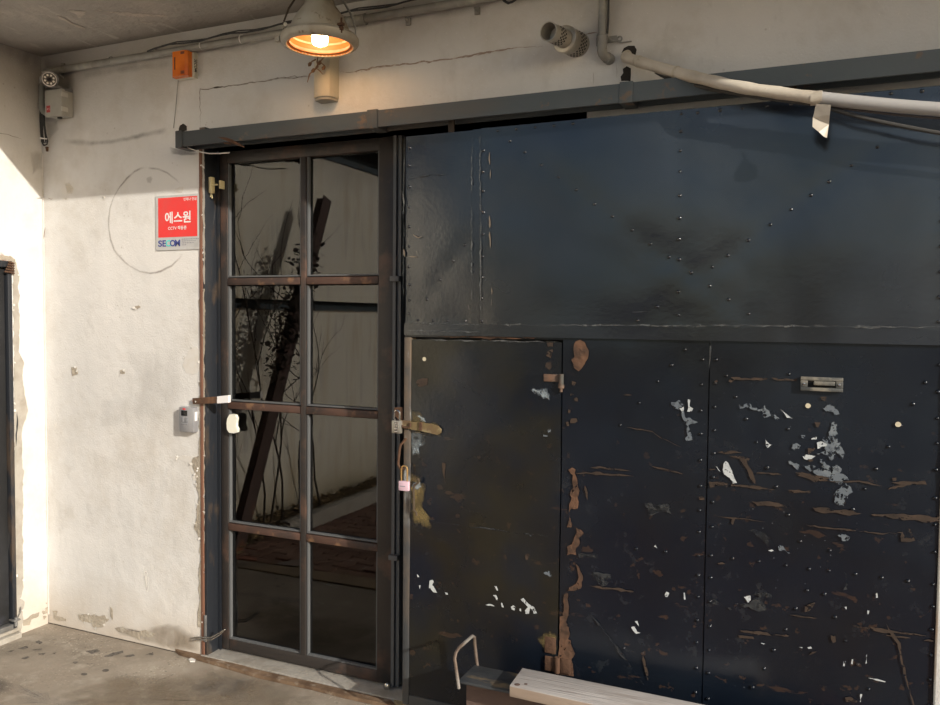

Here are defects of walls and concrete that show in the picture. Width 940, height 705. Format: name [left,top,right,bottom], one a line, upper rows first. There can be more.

corrosion [566,340,589,426]
spalling [0,255,66,632]
corrosion [410,480,428,523]
corrosion [709,456,791,507]
corrosion [813,507,940,523]
corrosion [544,468,611,676]
spalling [78,607,155,640]